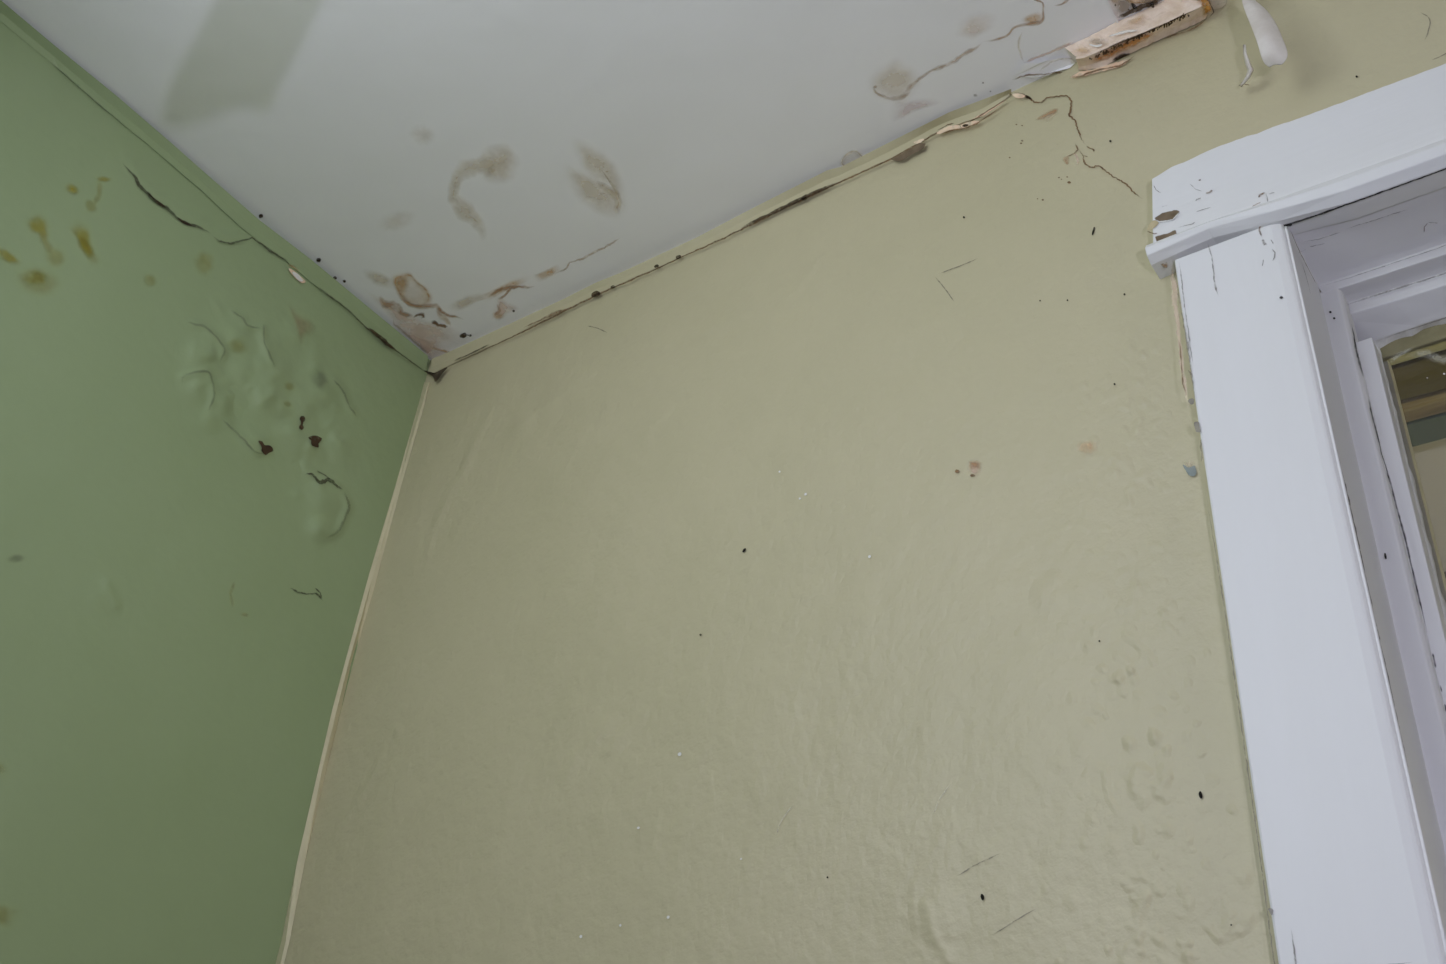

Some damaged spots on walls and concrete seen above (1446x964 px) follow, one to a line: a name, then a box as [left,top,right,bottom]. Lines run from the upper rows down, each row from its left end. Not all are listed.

peeling [1239,0,1288,87]
crack [1022,93,1159,195]
crack [128,169,284,259]
crack [1253,168,1446,295]
leakage [384,302,472,351]